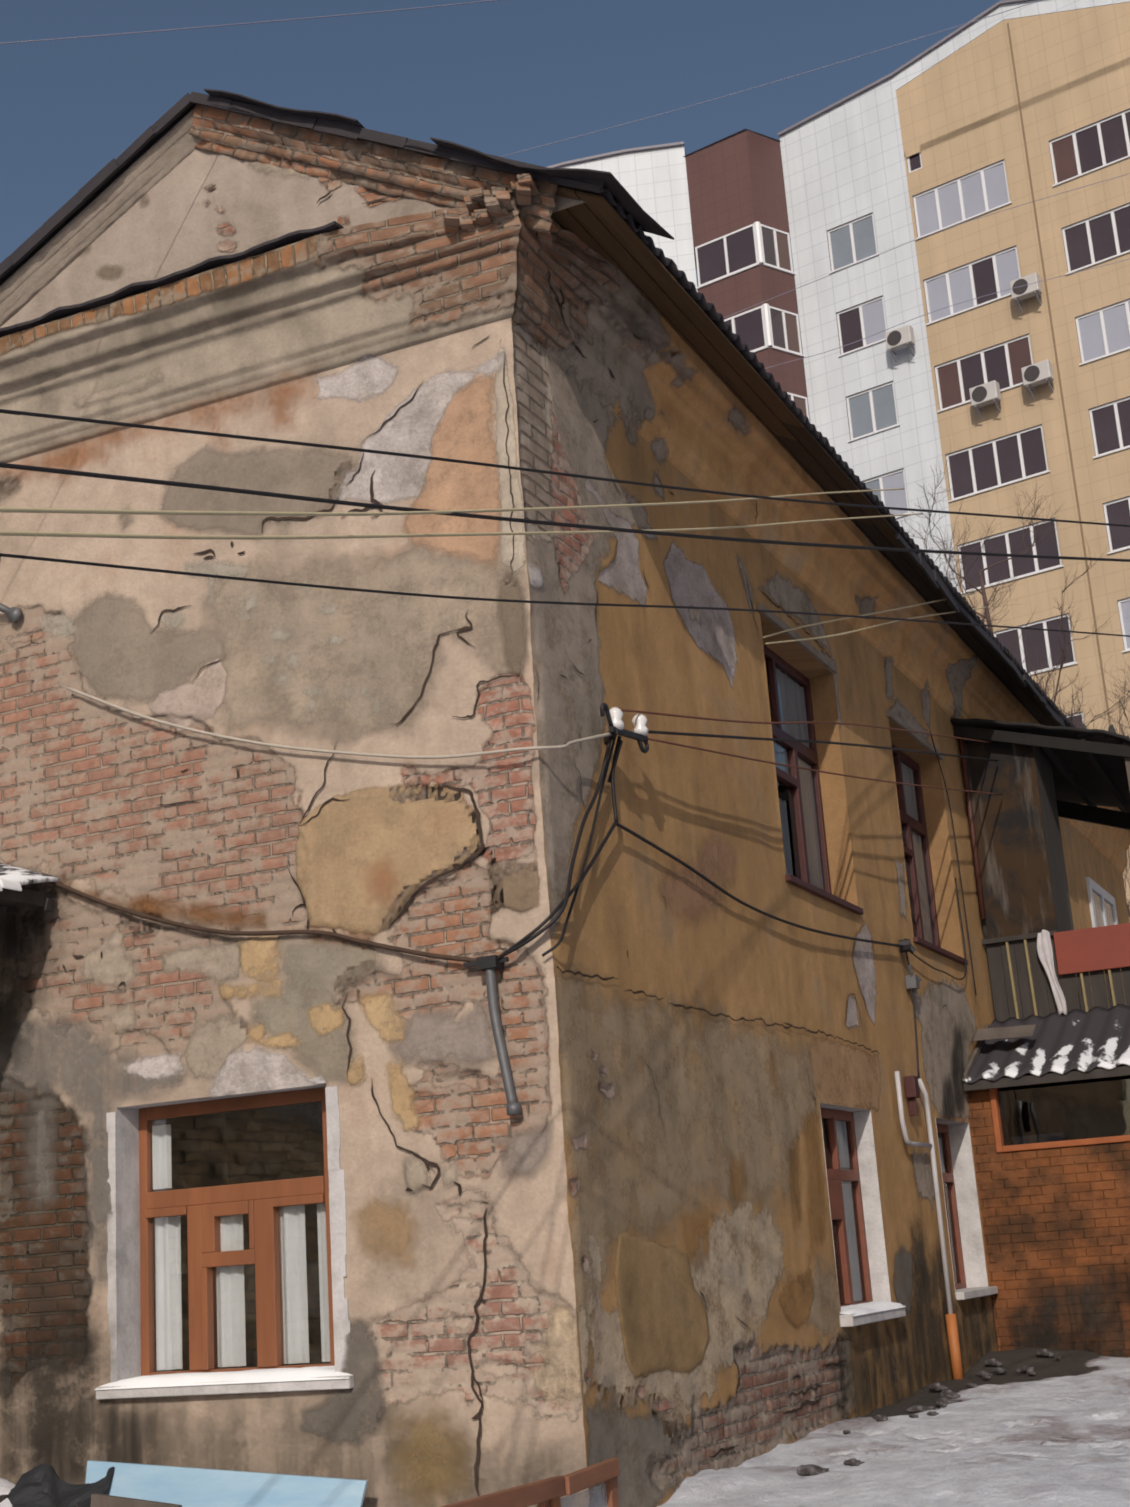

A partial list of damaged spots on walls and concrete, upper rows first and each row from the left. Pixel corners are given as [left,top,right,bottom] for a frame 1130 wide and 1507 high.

crack [194,381,423,559]
crack [288,868,337,933]
crack [298,737,349,826]
crack [388,785,485,930]
peeling [0,158,880,1491]
crack [557,950,879,1101]
crack [341,993,488,1496]
damp [838,1234,1130,1415]